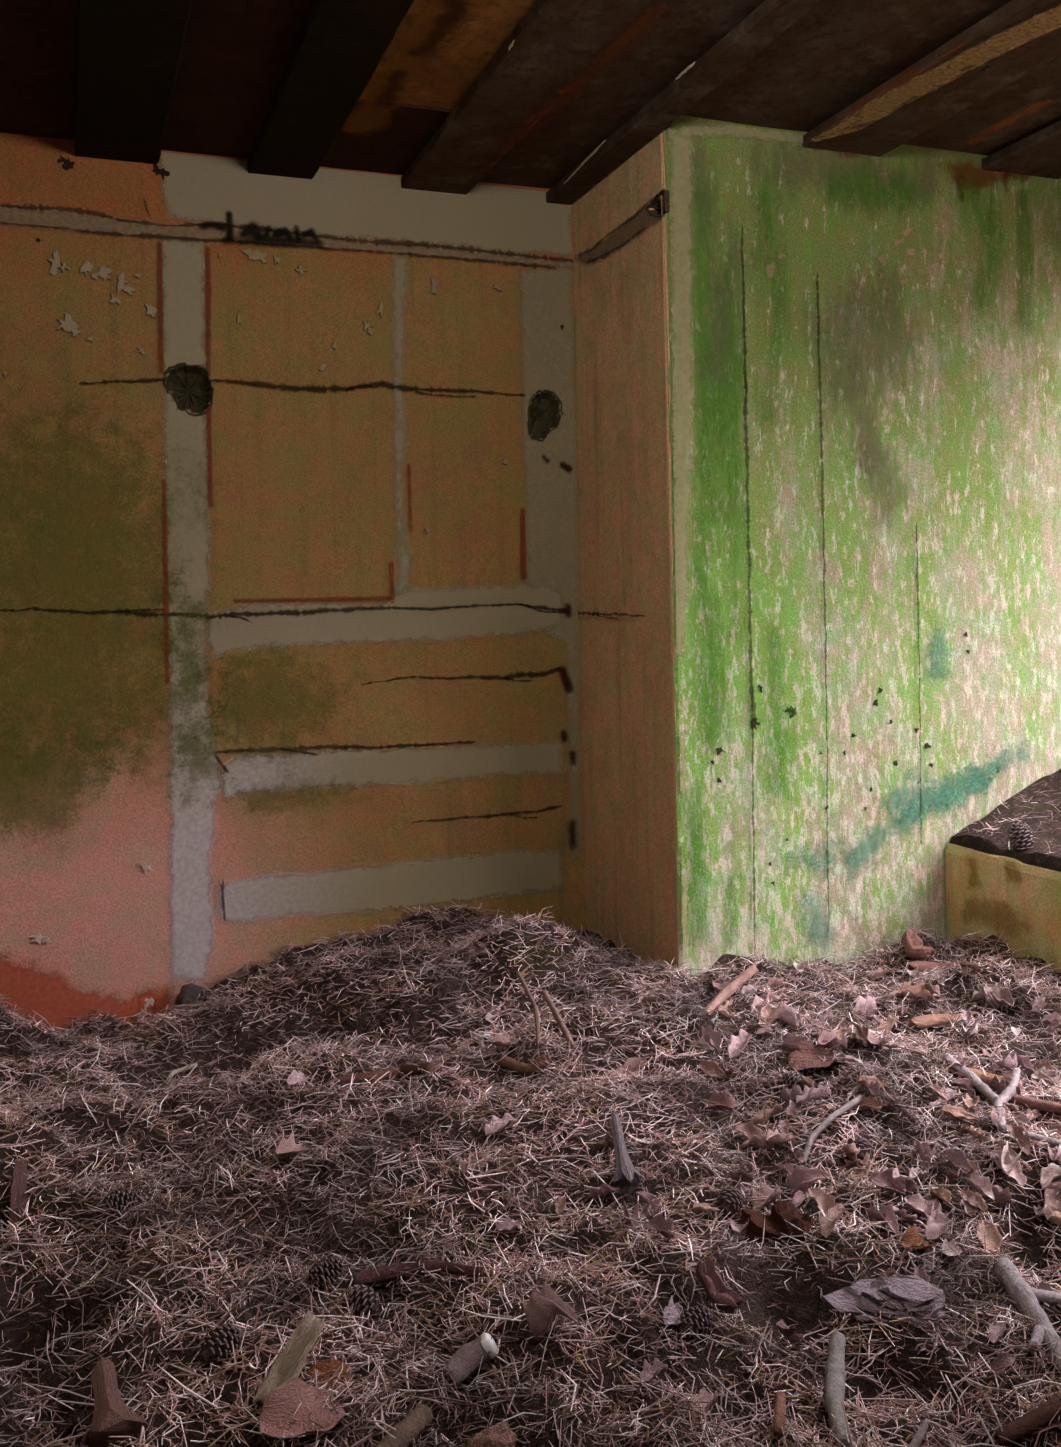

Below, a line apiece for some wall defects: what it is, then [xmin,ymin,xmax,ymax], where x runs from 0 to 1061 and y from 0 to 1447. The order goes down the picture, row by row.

peeling [564,139,606,184]
crack [79,377,166,385]
crack [210,379,526,397]
flaking render [47,152,580,981]
crack [0,603,644,623]
crack [362,667,562,685]
crack [213,741,475,773]